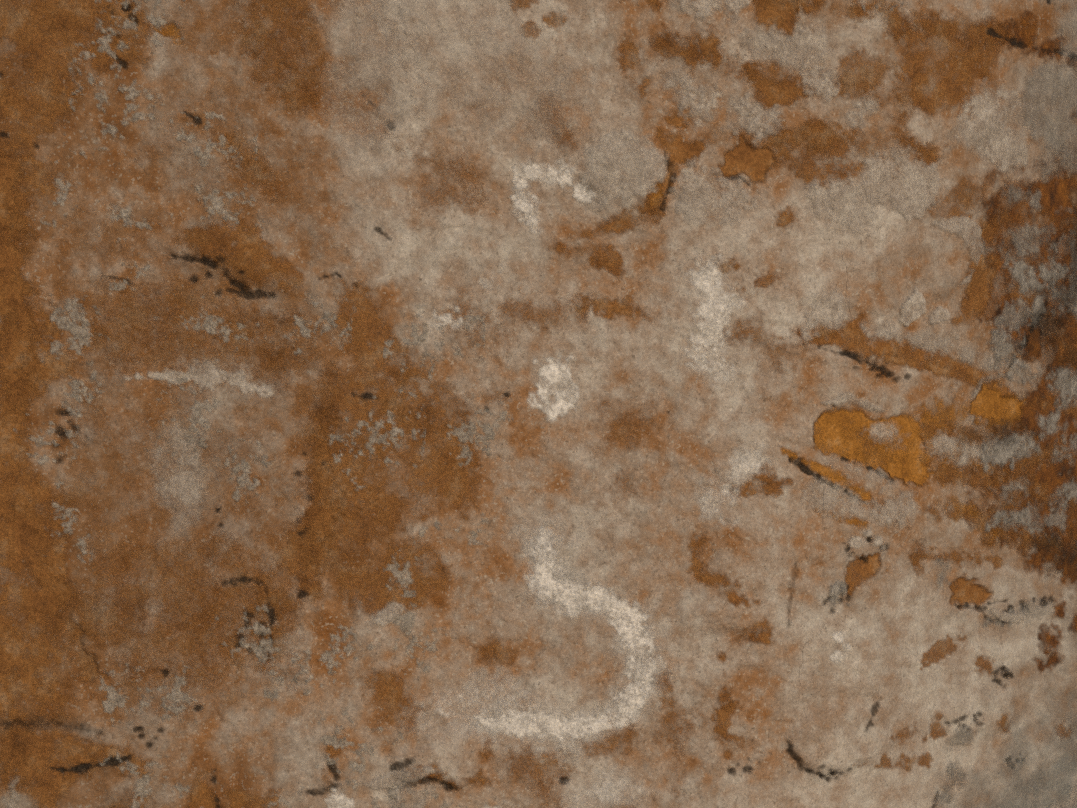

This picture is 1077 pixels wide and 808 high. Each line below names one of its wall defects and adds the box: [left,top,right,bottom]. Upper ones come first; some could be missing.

rust [0,0,152,158]
rust [656,23,816,111]
rust [754,0,824,38]
rust [833,0,1077,166]
crack [987,28,1077,60]
rust [781,162,1077,583]
spalling [970,377,1025,426]
spalling [814,393,934,486]
spalling [830,546,887,611]
spalling [950,577,1053,623]
rust [920,635,966,670]
rust [1035,602,1077,671]